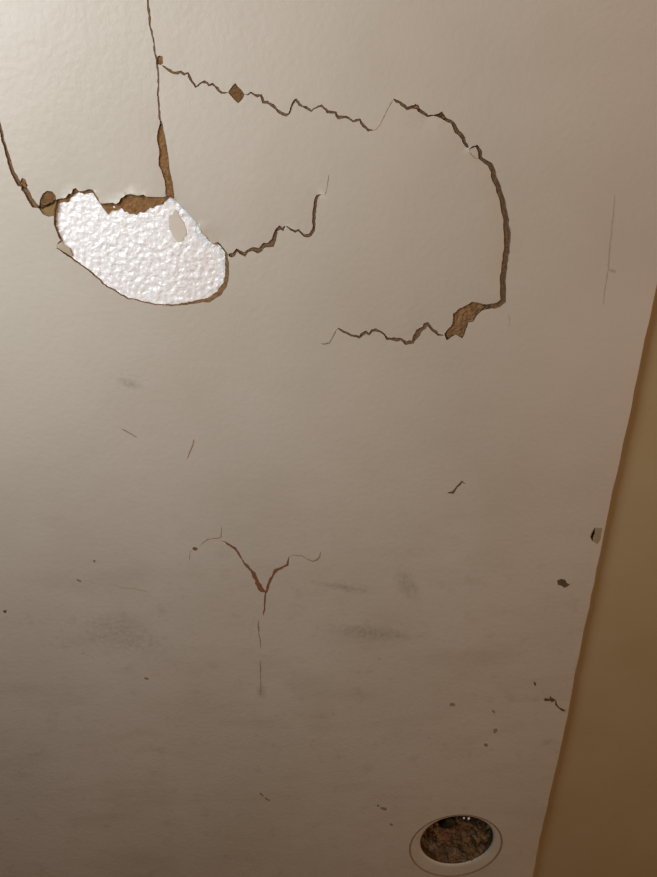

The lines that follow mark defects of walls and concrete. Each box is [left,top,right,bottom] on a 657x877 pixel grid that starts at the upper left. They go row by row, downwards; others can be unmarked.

crack [0,123,39,208]
crack [147,0,511,309]
spalling [39,188,229,306]
crack [321,322,443,345]
crack [189,527,321,694]